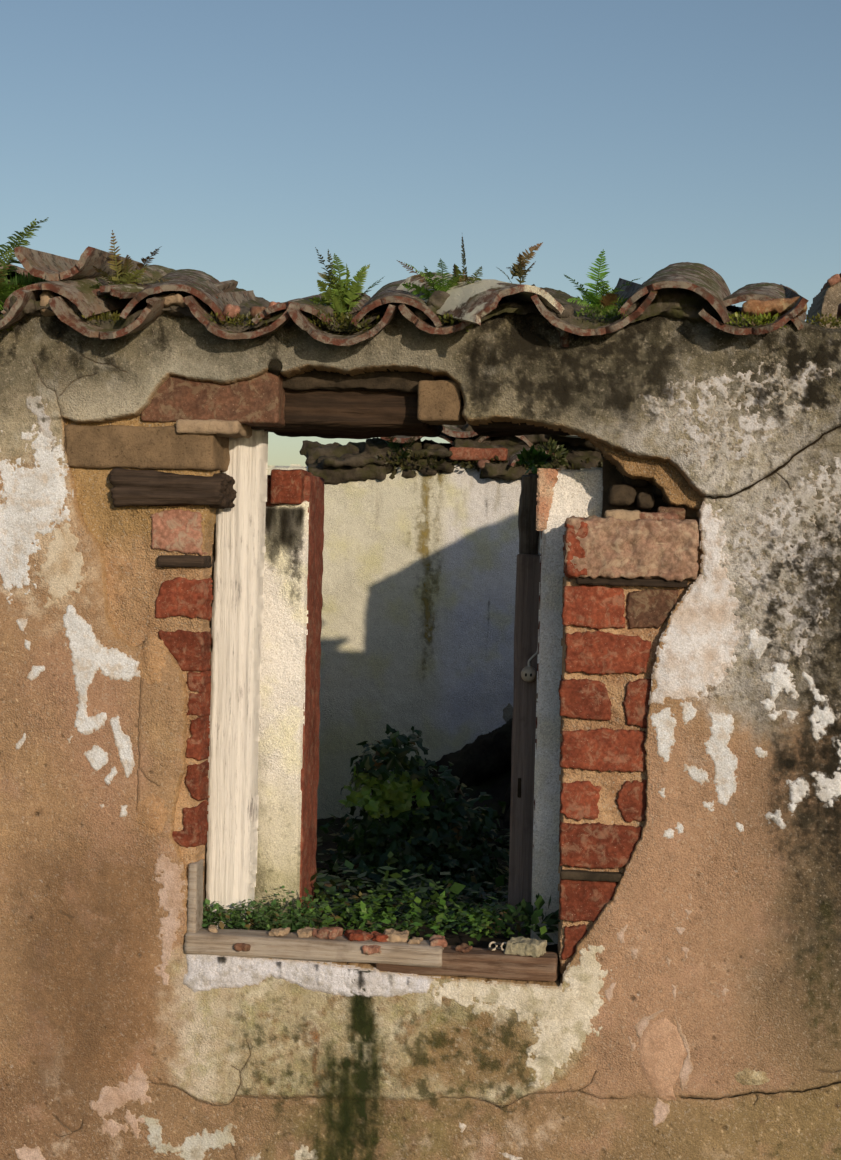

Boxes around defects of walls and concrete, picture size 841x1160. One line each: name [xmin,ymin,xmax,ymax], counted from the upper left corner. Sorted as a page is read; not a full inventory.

damp [39,315,82,362]
spalling [608,475,686,521]
crack [704,426,841,499]
peeling [0,396,141,785]
peeling [649,452,841,829]
damp [761,528,841,872]
damp [349,969,369,1028]
peeling [154,851,616,1088]
peeling [89,1063,237,1160]
crack [151,1040,328,1106]
crack [441,1070,626,1113]
spalling [628,1009,693,1126]